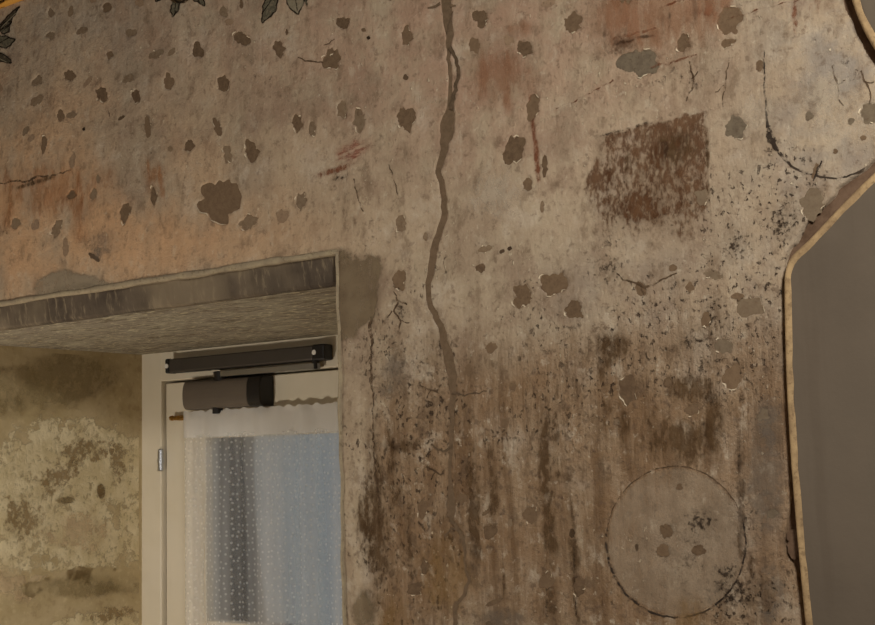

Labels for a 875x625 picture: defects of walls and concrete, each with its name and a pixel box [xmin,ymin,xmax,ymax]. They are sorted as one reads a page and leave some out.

flaking render [616,48,659,78]
flaking render [197,180,259,231]
rust [584,113,709,236]
crack [366,0,487,625]
water stain [648,376,727,464]
peeling [0,416,139,573]
water stain [357,434,418,575]
water stain [467,463,498,547]
water stain [539,413,559,553]
water stain [569,530,580,621]
water stain [715,566,752,610]